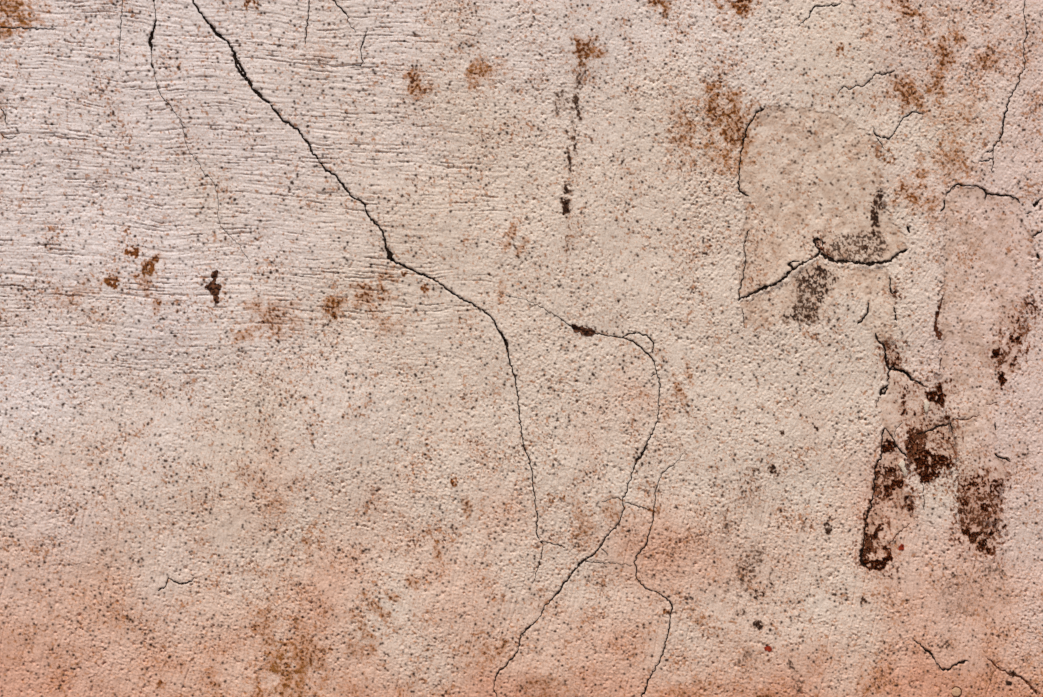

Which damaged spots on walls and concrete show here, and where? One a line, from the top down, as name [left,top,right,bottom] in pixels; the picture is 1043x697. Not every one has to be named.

corrosion [714,0,759,18]
crack [148,0,249,260]
corrosion [668,68,759,171]
crack [738,109,764,196]
crack [838,70,895,93]
crack [873,111,922,148]
crack [940,1,1042,259]
crack [192,0,681,697]
spalling [736,104,1042,579]